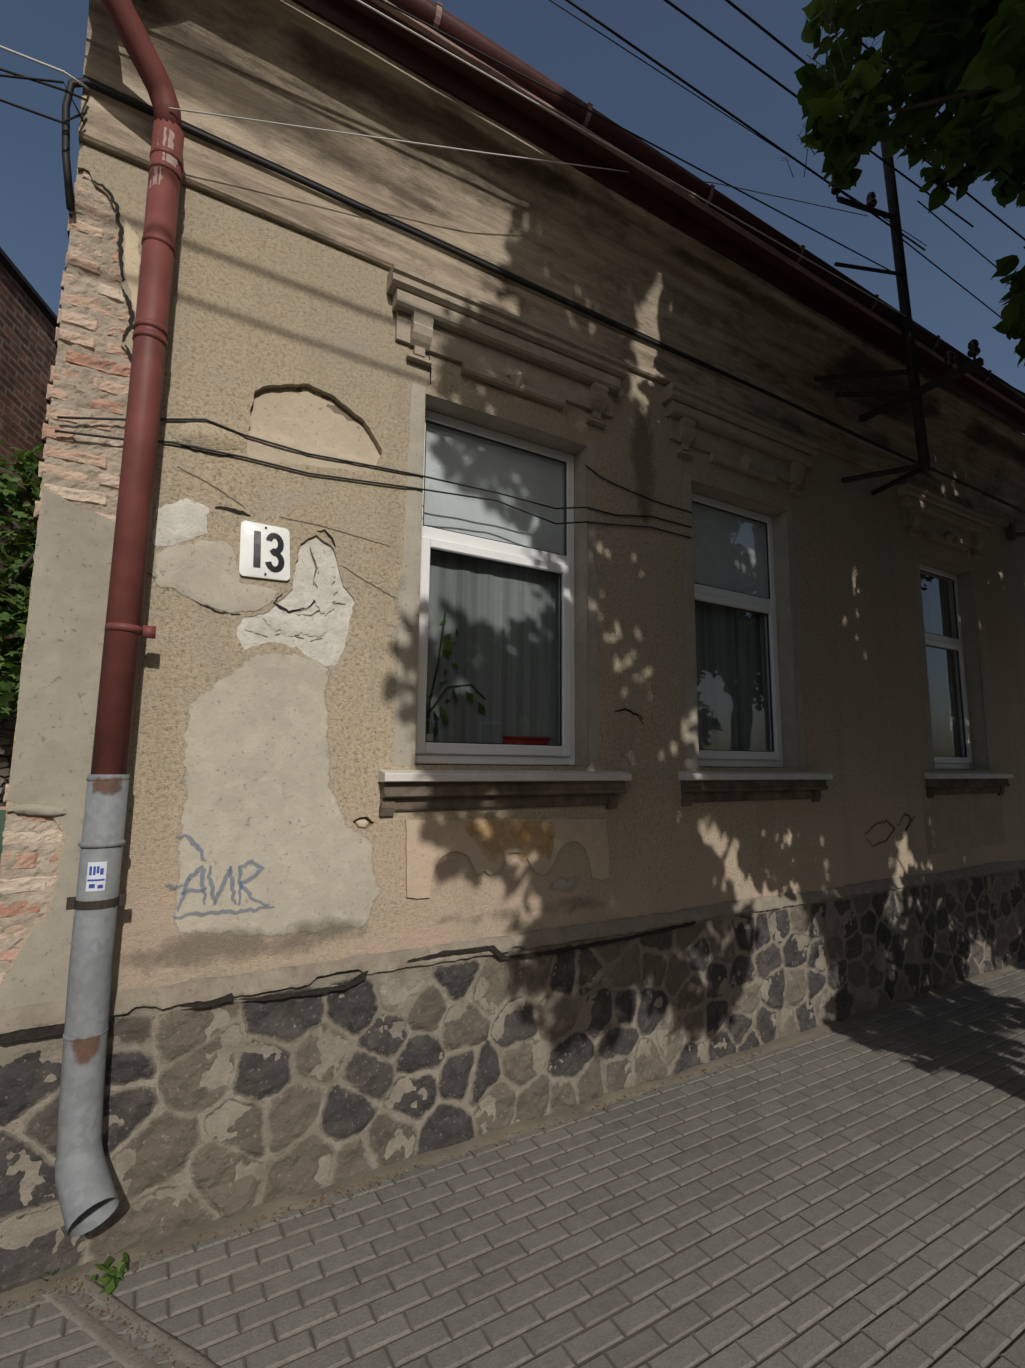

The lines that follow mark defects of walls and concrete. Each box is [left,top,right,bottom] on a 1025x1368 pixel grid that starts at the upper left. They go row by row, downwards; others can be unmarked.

leakage [161,22,327,139]
leakage [302,34,560,185]
flaking render [34,164,141,523]
spalling [236,536,355,666]
flaking render [0,784,67,983]